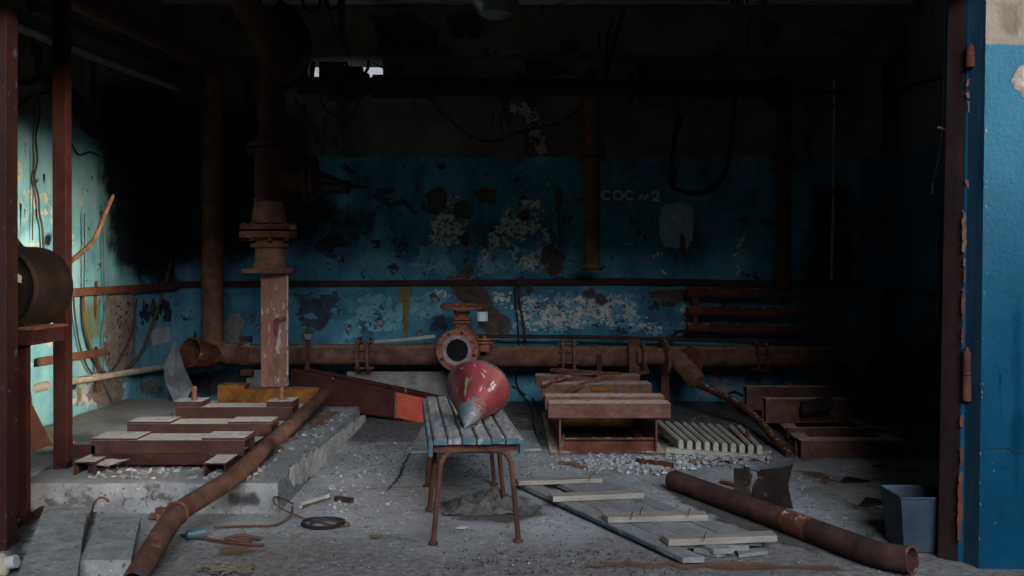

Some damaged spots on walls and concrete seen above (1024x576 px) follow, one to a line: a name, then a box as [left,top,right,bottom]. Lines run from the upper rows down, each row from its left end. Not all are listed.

flaking render [1011,65,1024,98]
peeling [293,185,688,341]
flaking render [73,293,172,409]